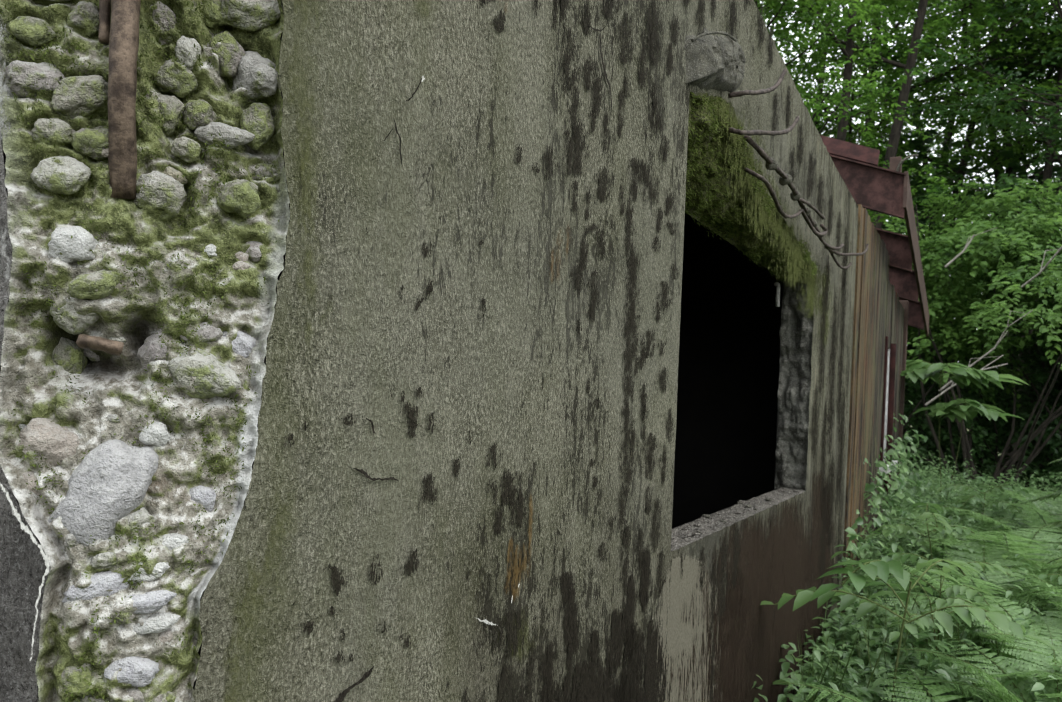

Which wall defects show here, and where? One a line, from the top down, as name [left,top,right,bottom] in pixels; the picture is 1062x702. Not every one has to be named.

water stain [397,280,434,311]
spalling [0,0,290,702]
water stain [461,0,849,702]
water stain [340,414,376,435]
water stain [390,387,441,438]
water stain [422,471,438,505]
crack [0,483,50,660]
water stain [369,554,383,586]
water stain [403,549,422,576]
water stain [323,564,349,615]
water stain [334,628,355,663]